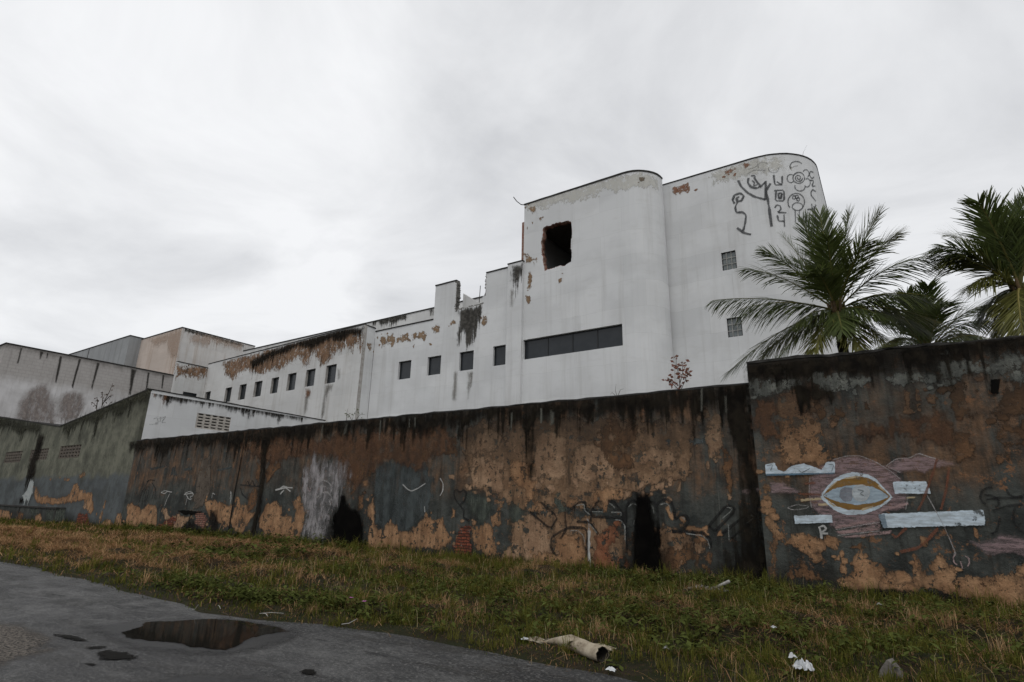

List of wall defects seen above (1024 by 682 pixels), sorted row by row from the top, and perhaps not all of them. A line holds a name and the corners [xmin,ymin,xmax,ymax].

flaking render [672,182,698,195]
peeling [172,363,208,381]
peeling [222,276,487,381]
water stain [457,305,482,350]
water stain [510,263,523,298]
water stain [902,336,1024,391]
peeling [0,443,307,542]
water stain [0,352,885,583]
peeling [349,409,734,576]
peeling [756,469,1024,608]